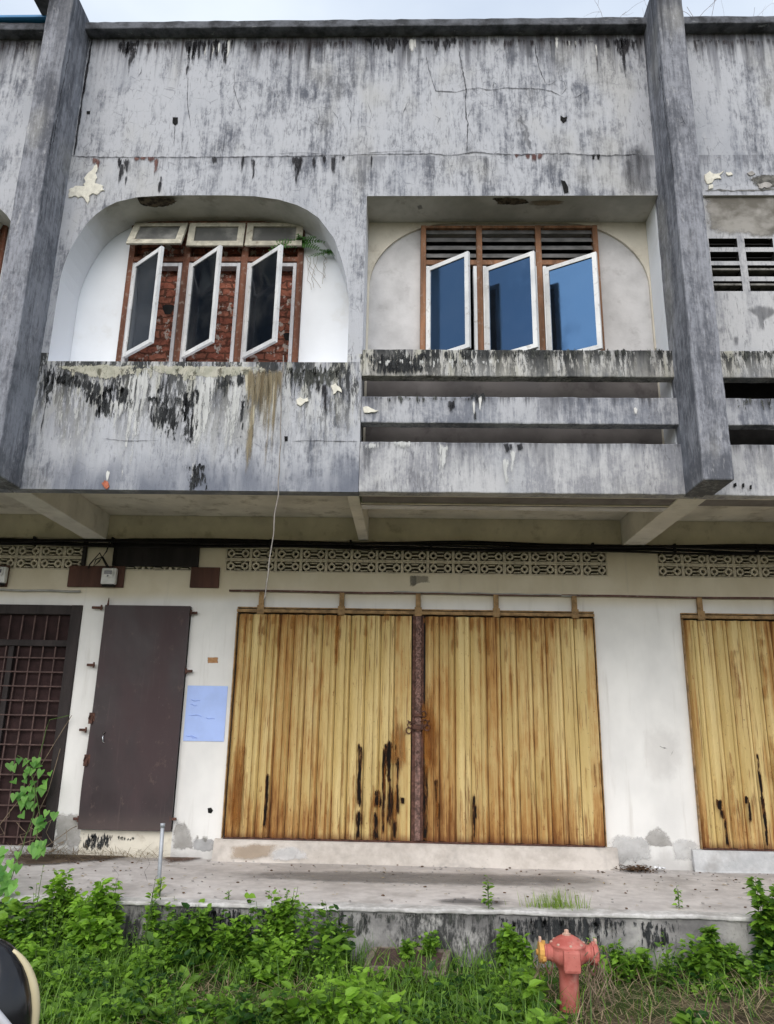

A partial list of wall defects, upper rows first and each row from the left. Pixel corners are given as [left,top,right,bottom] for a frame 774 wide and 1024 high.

leakage [118,39,352,74]
crack [77,47,636,158]
peeling [68,165,105,204]
leakage [118,158,130,185]
leakage [292,156,345,184]
flaking render [704,171,774,236]
leakage [363,348,670,375]
leakage [43,366,346,491]
leakage [83,833,134,851]
flaking render [173,824,214,851]
leakage [305,898,677,951]